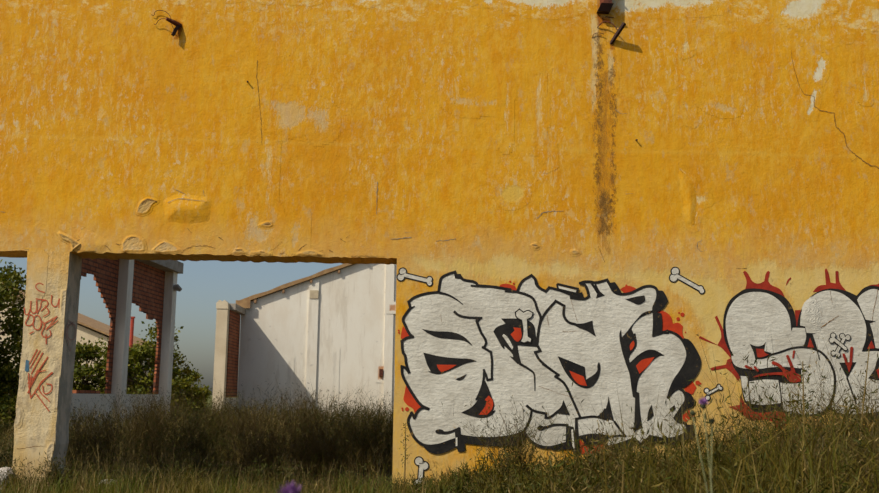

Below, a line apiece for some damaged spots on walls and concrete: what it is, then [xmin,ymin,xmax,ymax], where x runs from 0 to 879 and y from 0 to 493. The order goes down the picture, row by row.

peeling [463,0,598,20]
peeling [609,0,738,23]
peeling [770,0,842,31]
peeling [854,0,879,32]
water stain [579,9,622,235]
crack [791,53,878,168]
spalling [134,195,160,216]
spalling [120,233,183,254]
peeling [230,199,325,257]